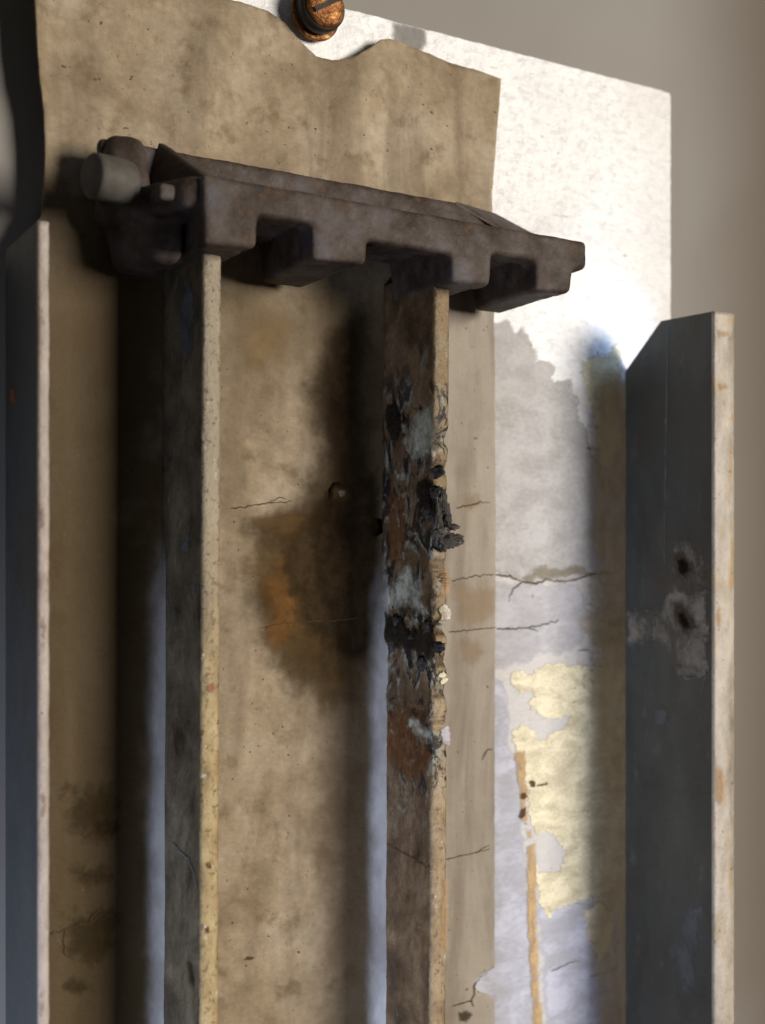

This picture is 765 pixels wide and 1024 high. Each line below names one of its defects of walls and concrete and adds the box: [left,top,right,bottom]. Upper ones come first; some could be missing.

crack [232,497,293,509]
leakage [257,454,361,702]
peeling [439,604,451,624]
crack [451,619,559,632]
crack [452,573,599,602]
leakage [627,545,709,679]
corrosion [387,708,432,776]
peeling [510,663,606,951]